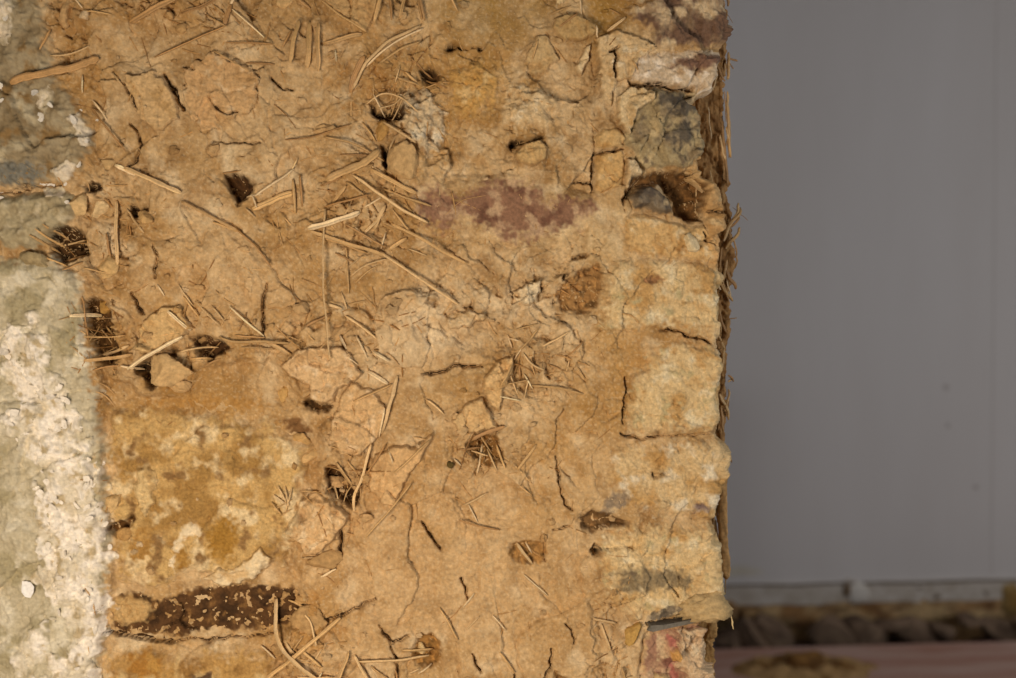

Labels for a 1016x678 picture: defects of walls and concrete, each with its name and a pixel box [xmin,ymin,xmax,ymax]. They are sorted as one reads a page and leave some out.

crack [163,73,186,111]
crack [123,82,144,166]
spalling [397,0,733,249]
crack [130,292,145,315]
crack [260,283,268,337]
crack [426,364,484,376]
flaking render [506,253,1016,678]
crack [421,520,441,550]
crack [543,456,573,562]
crack [101,602,274,645]
crack [378,625,409,678]
crack [544,624,576,678]